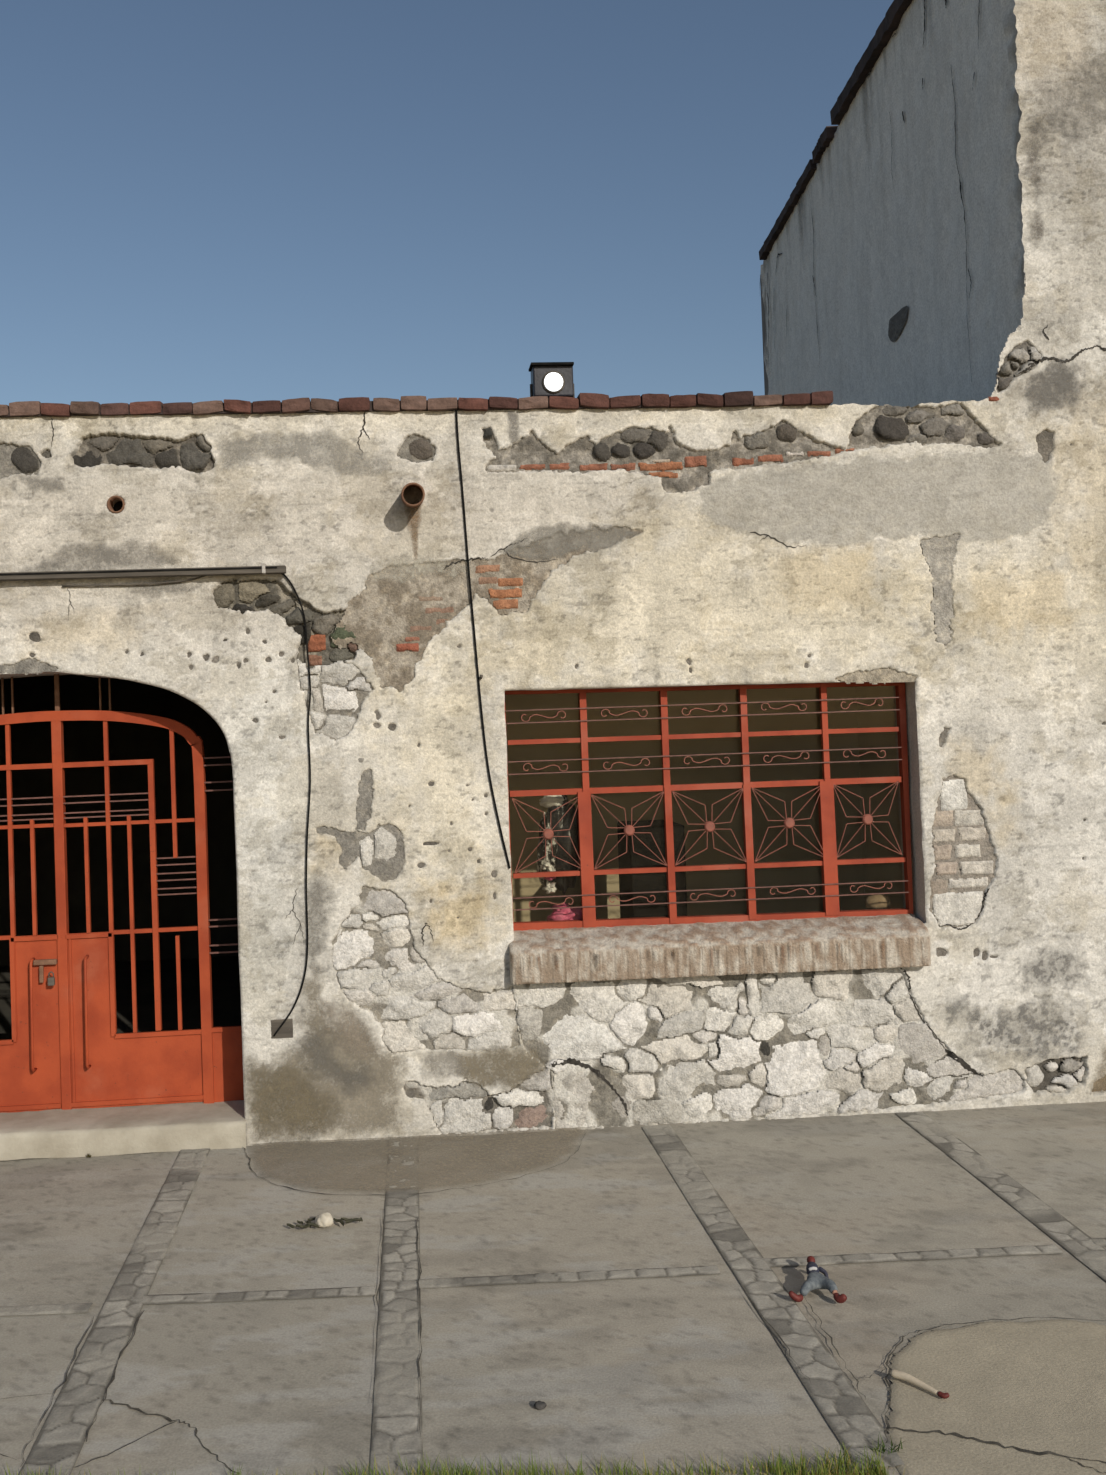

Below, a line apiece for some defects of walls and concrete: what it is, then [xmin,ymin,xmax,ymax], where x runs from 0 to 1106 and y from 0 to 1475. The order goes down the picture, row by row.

crack [865,0,980,382]
crack [1018,325,1106,374]
flaking render [0,444,51,479]
flaking render [72,435,215,473]
flaking render [482,403,999,493]
peeling [213,526,643,692]
peeling [316,758,425,882]
water stain [308,881,326,956]
water stain [247,982,399,1141]
water stain [426,1049,540,1088]
crack [743,1288,811,1383]
crack [805,1298,1106,1473]